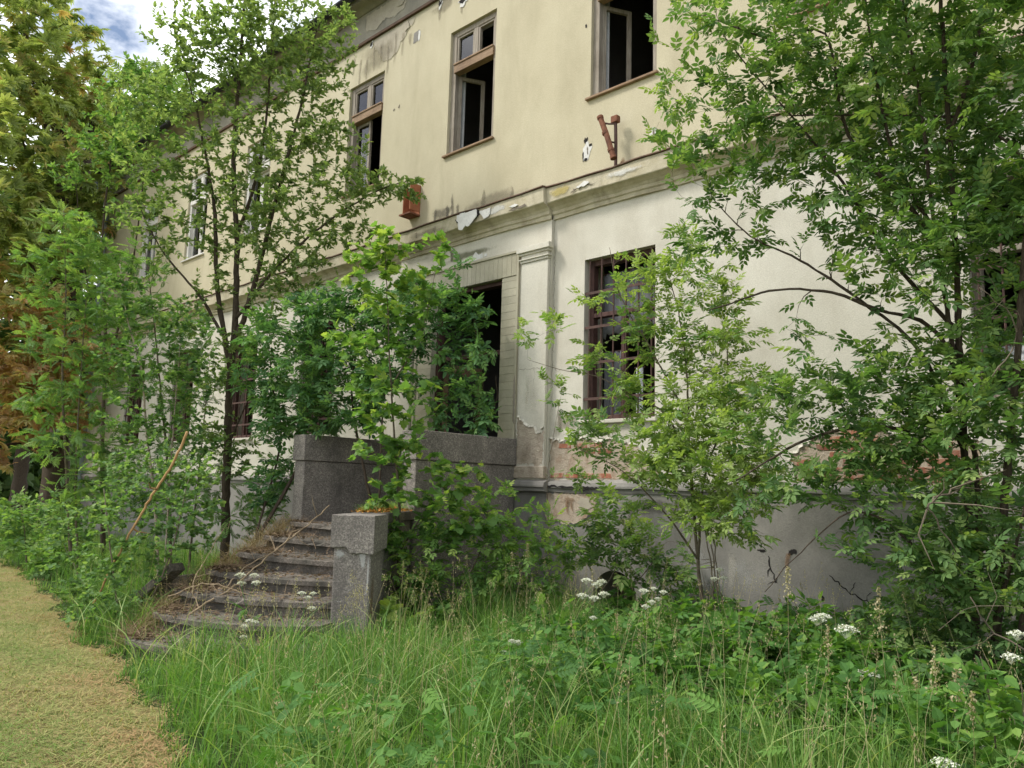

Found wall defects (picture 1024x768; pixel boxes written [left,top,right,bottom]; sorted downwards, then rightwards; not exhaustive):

spalling [582,137,592,161]
peeling [455,207,491,230]
flaking render [512,375,657,527]
crack [767,556,777,584]
crack [829,575,872,602]